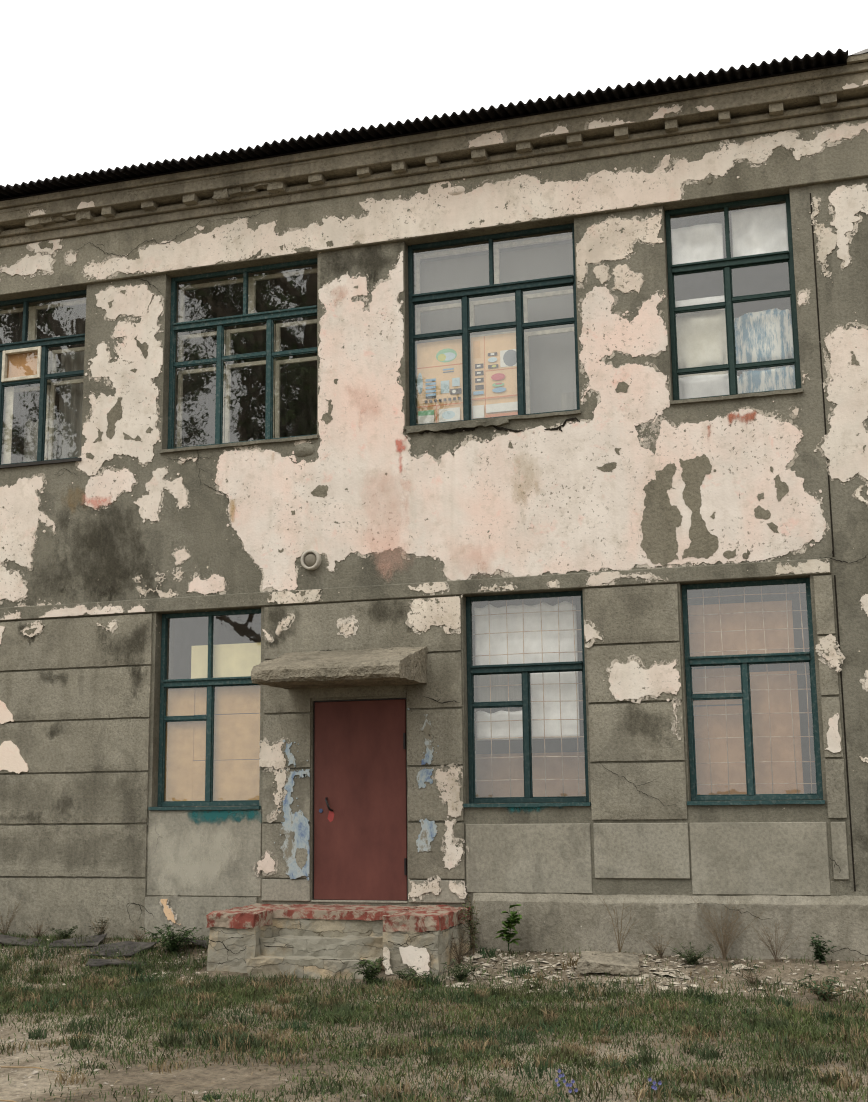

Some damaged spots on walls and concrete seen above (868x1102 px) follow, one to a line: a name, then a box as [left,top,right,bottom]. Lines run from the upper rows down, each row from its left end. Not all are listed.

peeling [0,121,868,648]
damp [57,523,148,592]
peeling [815,634,845,672]
peeling [0,700,14,724]
spalling [262,669,326,681]
peeling [603,654,682,740]
peeling [859,670,868,692]
peeling [825,713,841,753]
peeling [0,741,29,774]
peeling [253,737,310,881]